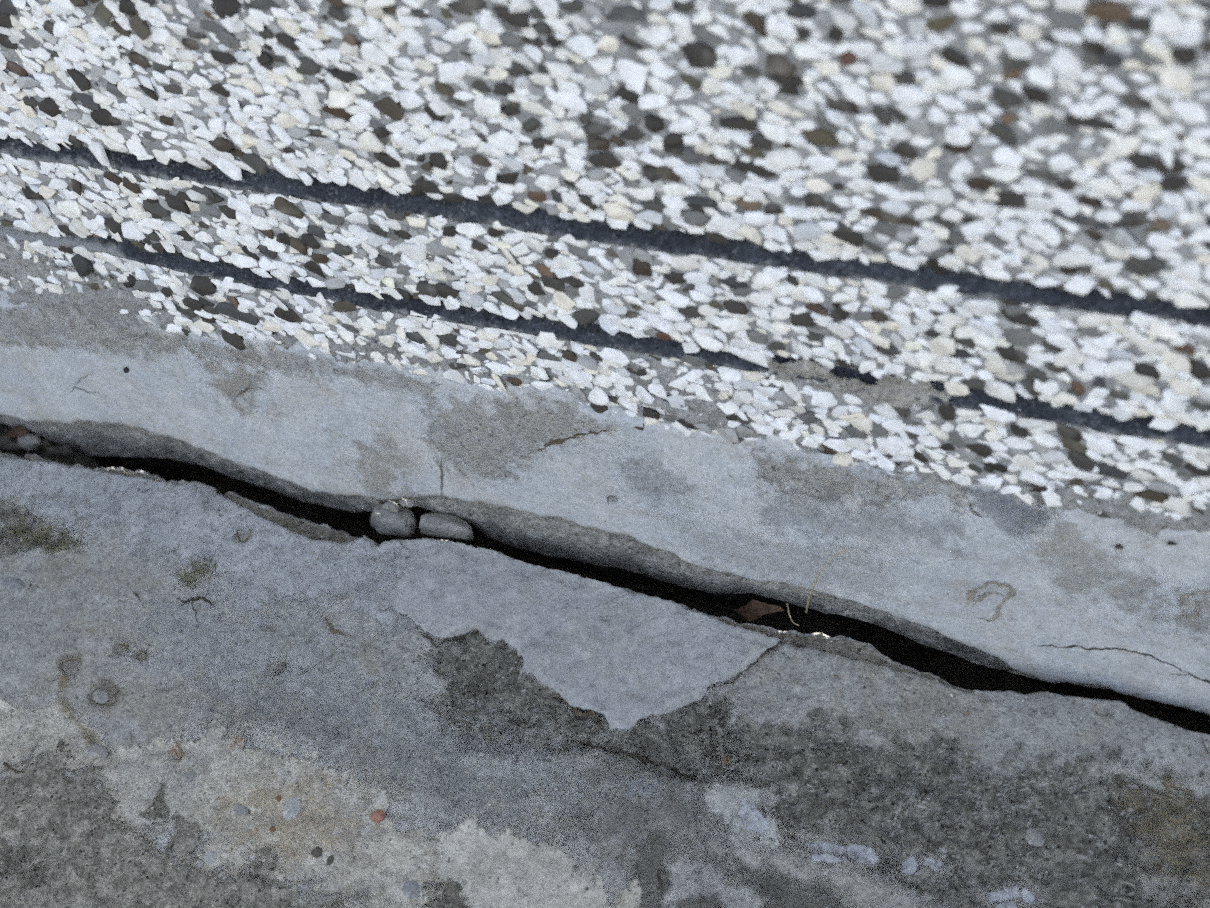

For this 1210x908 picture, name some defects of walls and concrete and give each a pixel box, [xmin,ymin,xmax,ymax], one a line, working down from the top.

peeling [0,657,642,908]
crack [0,374,1210,754]
spalling [365,538,1210,908]